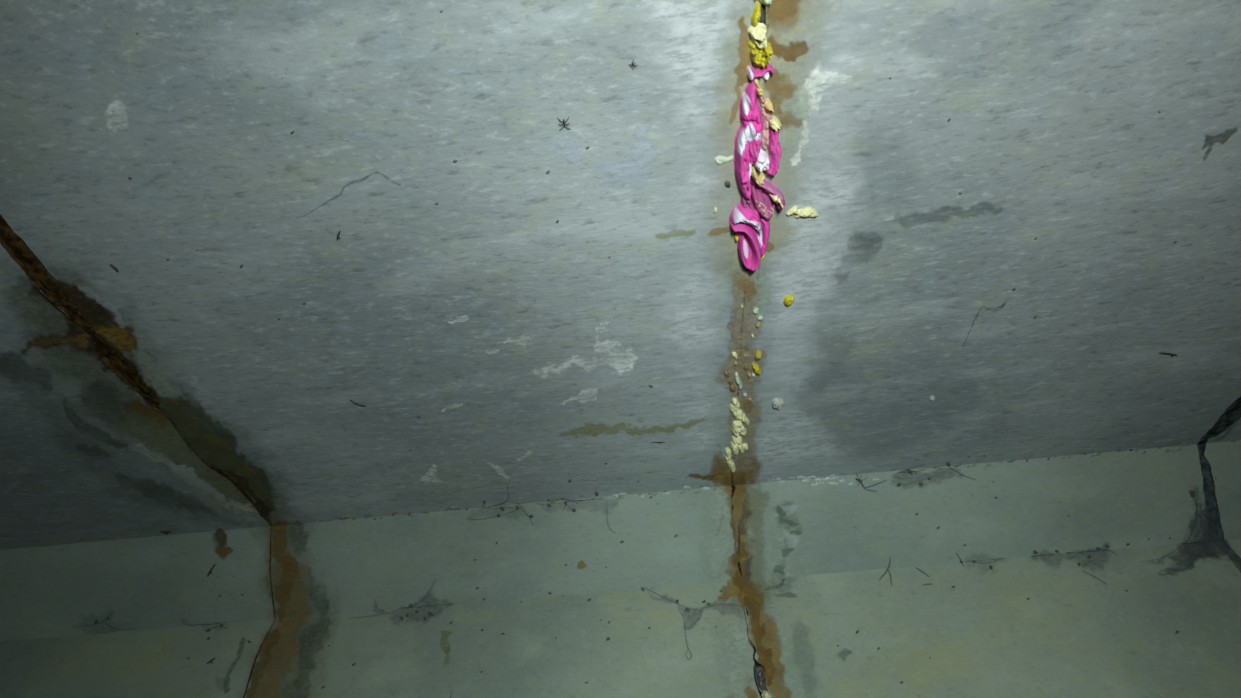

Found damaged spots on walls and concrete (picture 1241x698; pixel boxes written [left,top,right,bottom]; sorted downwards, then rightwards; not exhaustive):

crack [753,0,768,25]
rust [721,0,808,153]
rust [710,227,747,275]
rust [765,207,787,255]
rust [14,280,199,438]
crack [0,214,275,698]
rust [215,529,232,558]
crack [731,473,742,576]
rust [689,457,791,698]
crack [1197,396,1241,572]
crack [743,607,768,698]